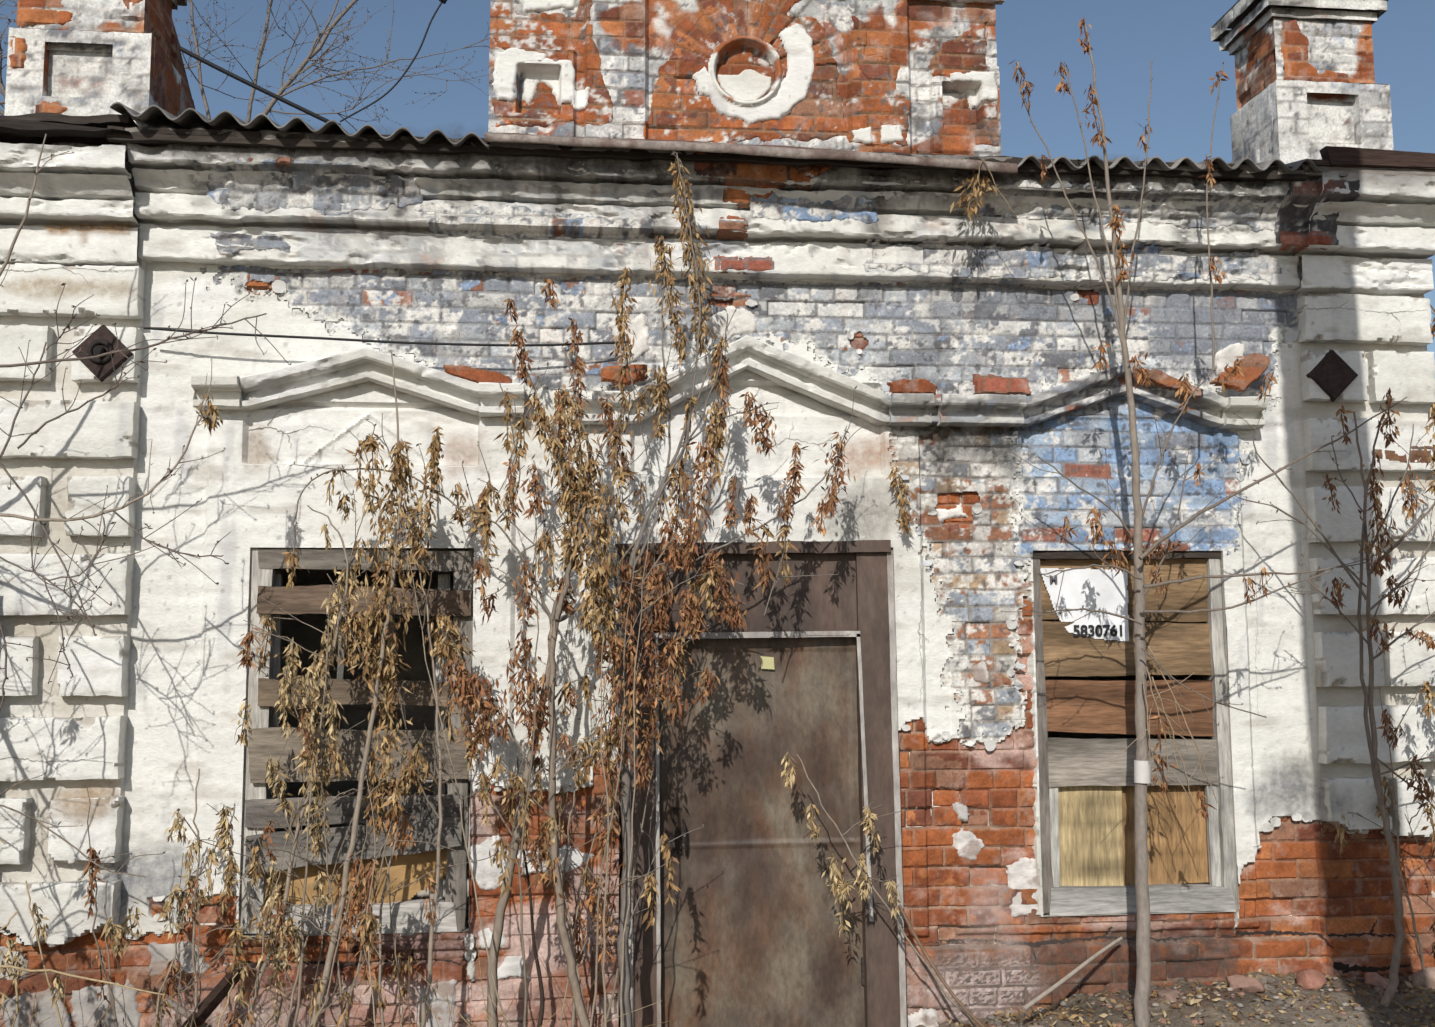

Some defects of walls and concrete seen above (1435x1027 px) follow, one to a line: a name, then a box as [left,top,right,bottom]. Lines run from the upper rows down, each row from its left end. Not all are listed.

spalling [9,0,73,69]
spalling [35,101,68,114]
peeling [184,0,1360,411]
spalling [889,395,1435,1027]
spalling [0,751,620,1027]